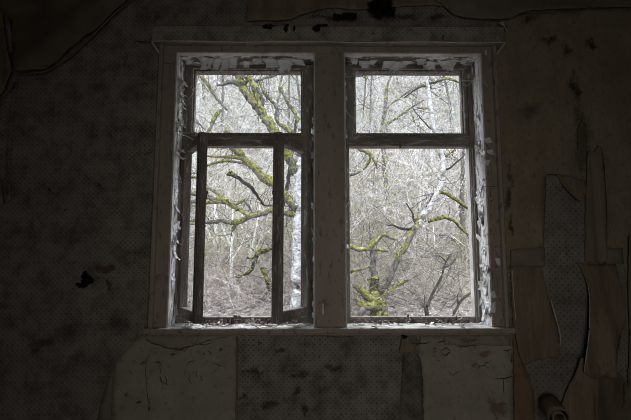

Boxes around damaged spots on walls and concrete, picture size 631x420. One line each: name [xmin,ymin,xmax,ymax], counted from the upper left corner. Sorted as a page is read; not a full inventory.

peeling [176,57,305,132]
peeling [351,59,468,72]
peeling [473,7,631,330]
peeling [172,174,182,260]
peeling [171,303,277,328]
spalling [111,335,236,420]
crack [142,336,228,409]
crack [417,336,489,420]
spalling [418,335,513,420]
crack [492,341,515,420]